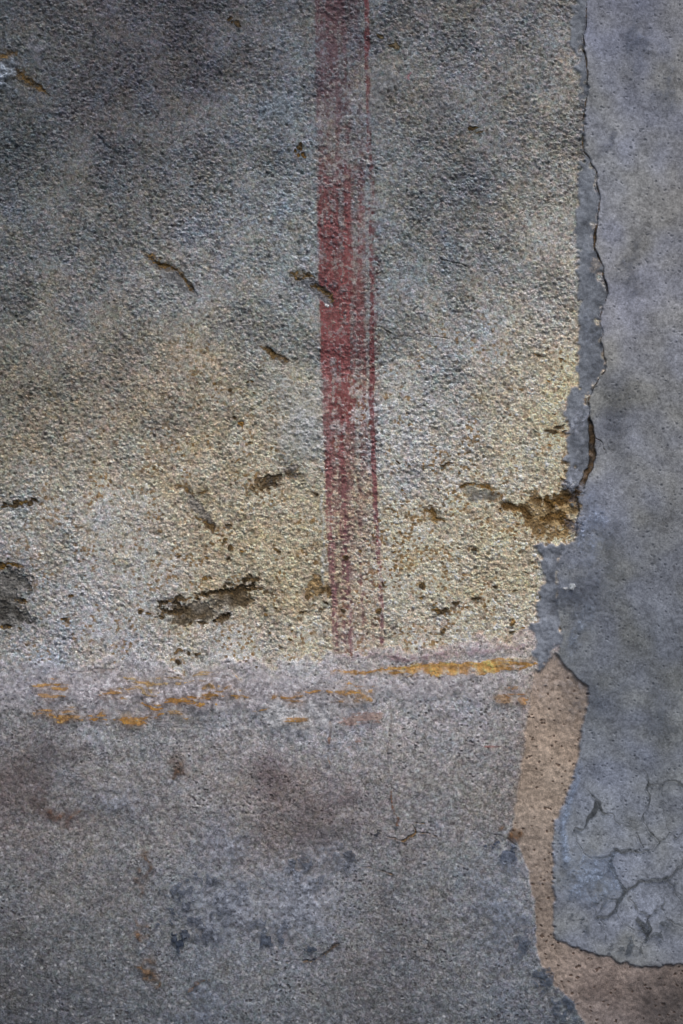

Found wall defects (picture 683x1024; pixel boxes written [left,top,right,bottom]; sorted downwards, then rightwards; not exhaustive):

crack [569,183,608,531]
spalling [499,470,582,543]
spalling [0,562,37,633]
spalling [138,574,283,630]
crack [573,765,683,953]